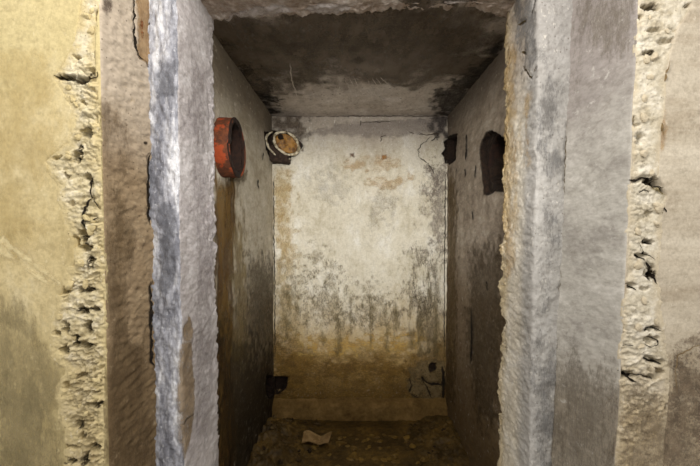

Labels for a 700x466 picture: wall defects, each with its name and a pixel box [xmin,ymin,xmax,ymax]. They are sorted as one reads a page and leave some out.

crack [133,0,150,67]
leakage [222,4,474,114]
leakage [427,41,503,140]
spalling [46,0,109,466]
crack [145,152,153,222]
crack [279,115,476,347]
spalling [615,0,692,466]
crack [148,280,156,366]
leakage [217,165,457,466]
crack [409,366,446,398]